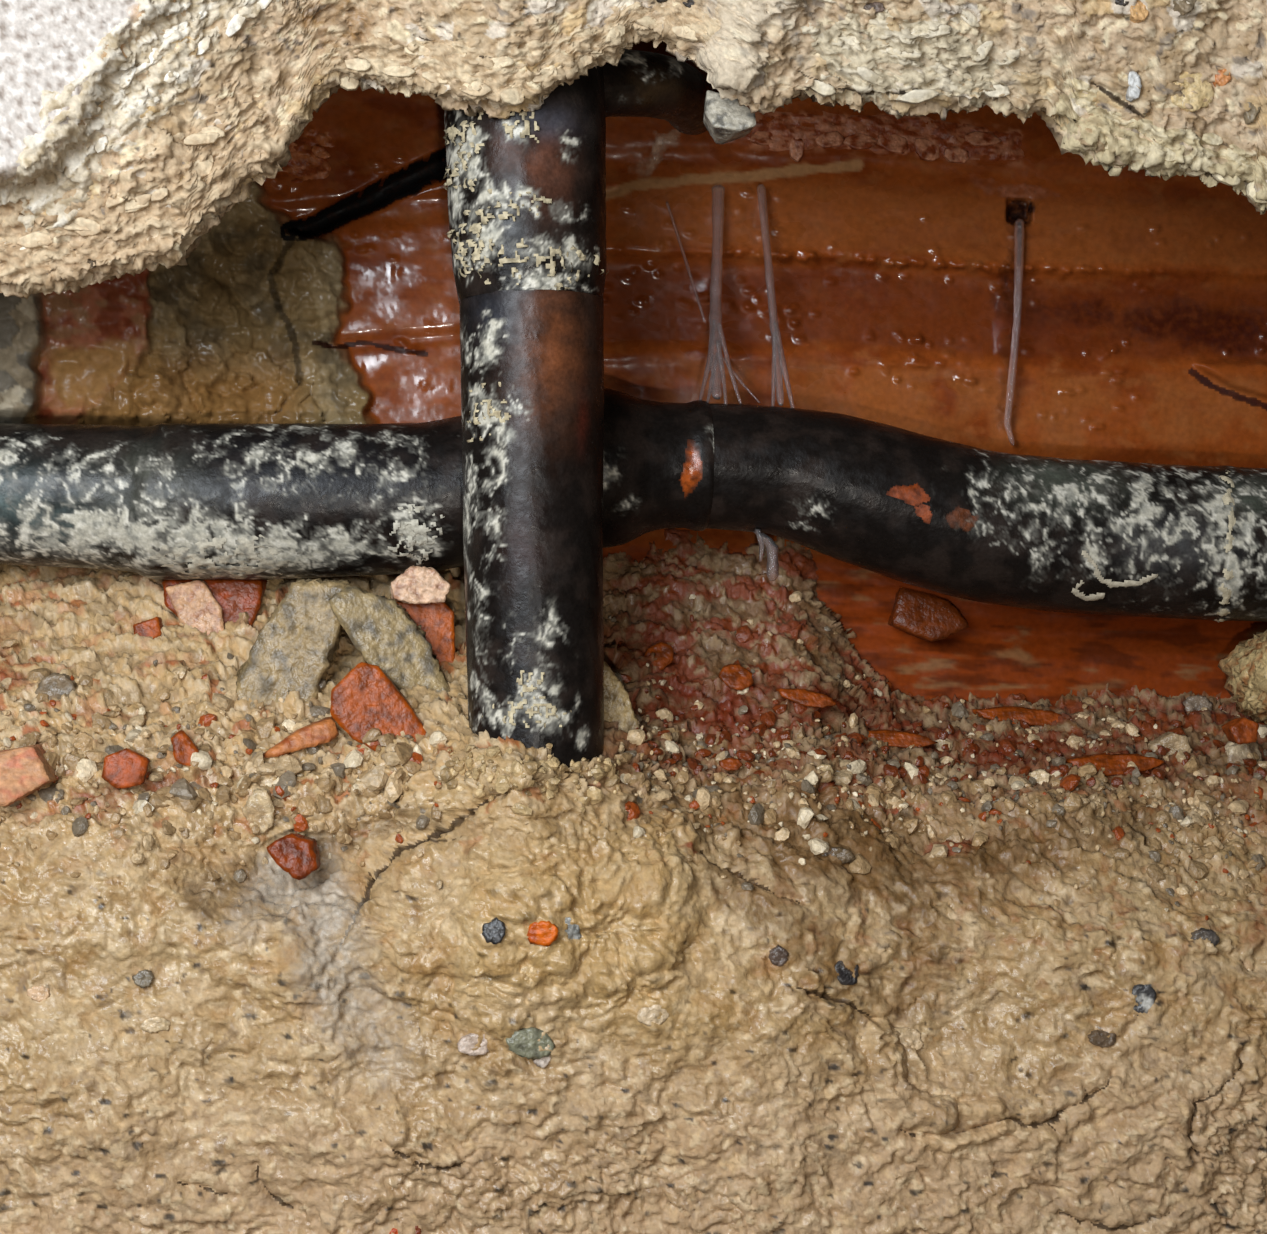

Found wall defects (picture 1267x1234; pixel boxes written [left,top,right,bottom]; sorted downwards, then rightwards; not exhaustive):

spalling [315,2,721,106]
spalling [703,9,1027,164]
spalling [0,0,335,295]
spalling [1056,78,1267,214]
peeling [681,449,702,492]
peeling [890,483,932,522]
crack [339,789,512,951]
leakage [191,858,359,1014]
crack [797,987,870,1017]
crack [957,1078,1110,1134]
crack [1188,1057,1243,1152]
crack [1059,1211,1170,1230]